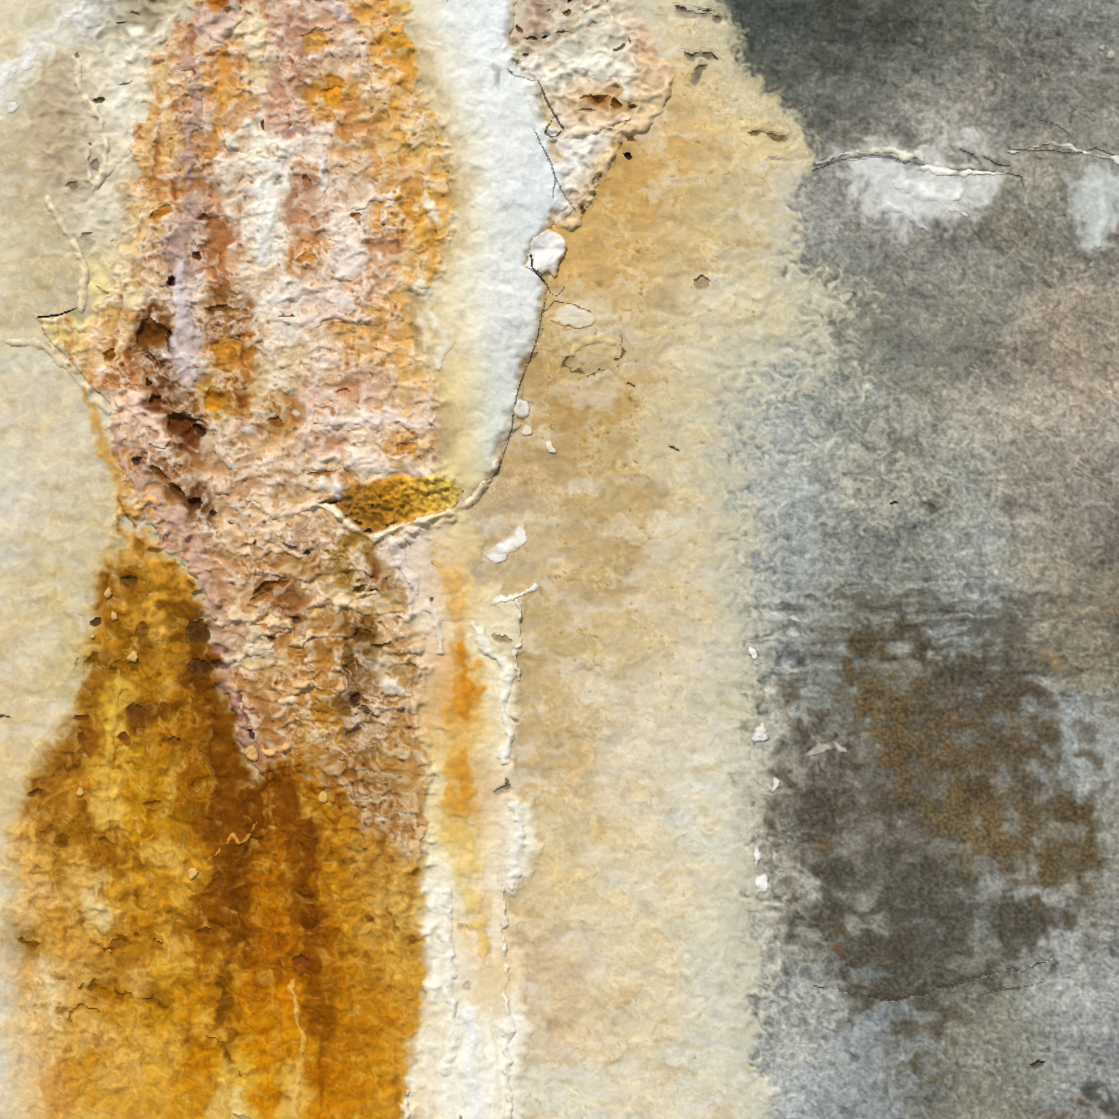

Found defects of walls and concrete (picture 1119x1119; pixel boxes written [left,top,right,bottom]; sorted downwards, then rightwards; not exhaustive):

rust [0,386,426,1119]
spalling [27,0,459,856]
rust [425,537,494,965]
leakage [671,0,1119,417]
leakage [719,398,1119,1119]
crack [1016,120,1108,154]